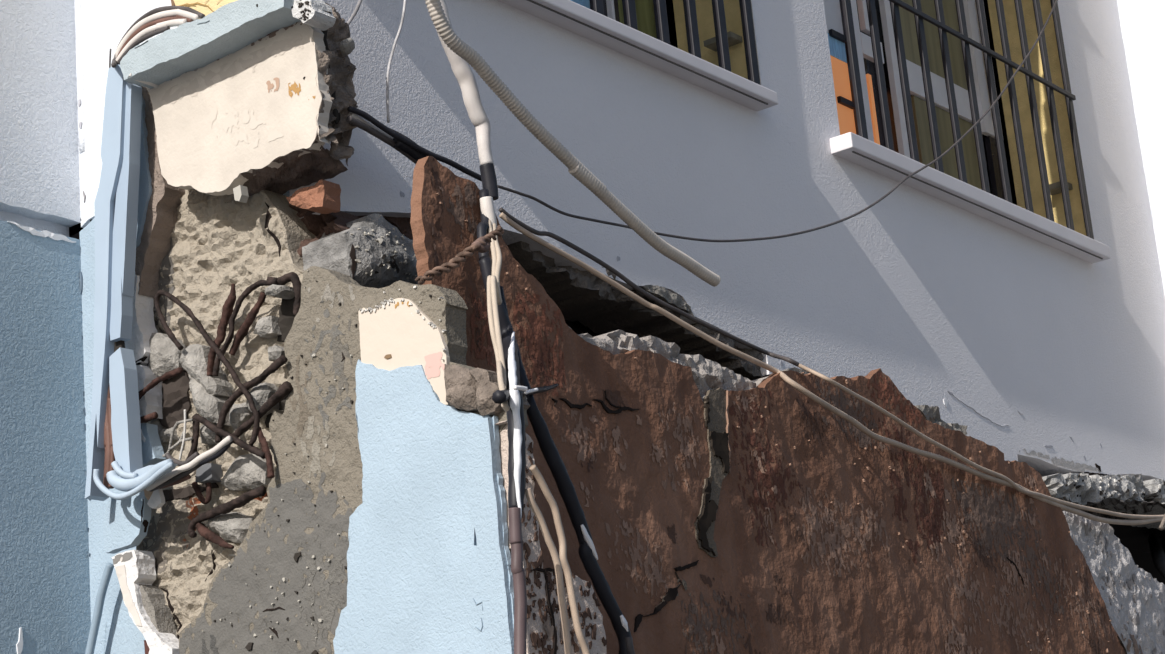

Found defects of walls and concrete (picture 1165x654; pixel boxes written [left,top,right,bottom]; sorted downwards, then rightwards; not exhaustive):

spalling [111,86,475,654]
spalling [495,409,507,433]
crack [551,390,639,414]
crack [947,390,1023,427]
spalling [1019,448,1101,516]
crack [619,388,731,654]